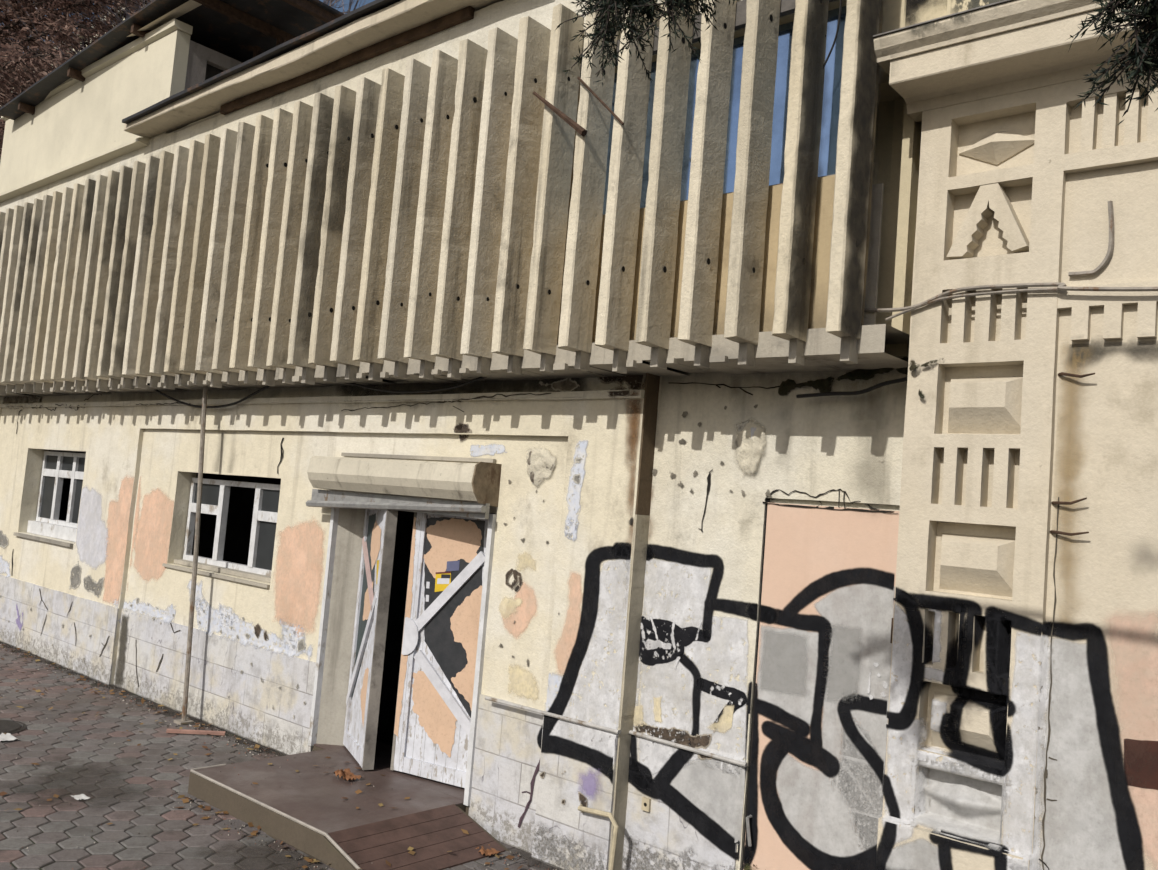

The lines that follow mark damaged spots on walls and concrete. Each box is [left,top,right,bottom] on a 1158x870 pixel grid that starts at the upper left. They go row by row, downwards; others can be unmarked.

spalling [527,451,554,502]
peeling [565,440,588,540]
crack [698,469,713,532]
peeling [187,580,312,658]